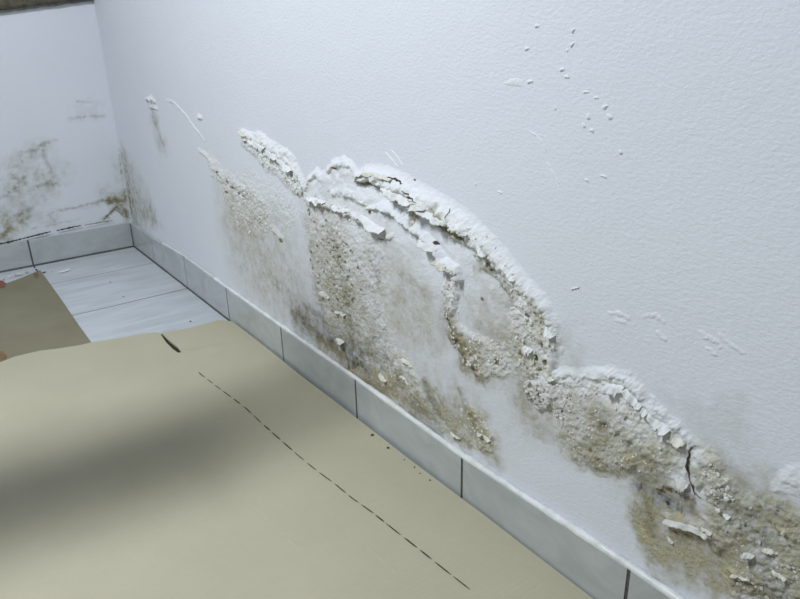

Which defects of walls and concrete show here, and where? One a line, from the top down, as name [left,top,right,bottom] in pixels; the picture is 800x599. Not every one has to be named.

water stain [424,382,487,447]
peeling [197,128,800,599]
water stain [617,449,764,595]
crack [685,446,711,504]
water stain [752,495,800,599]